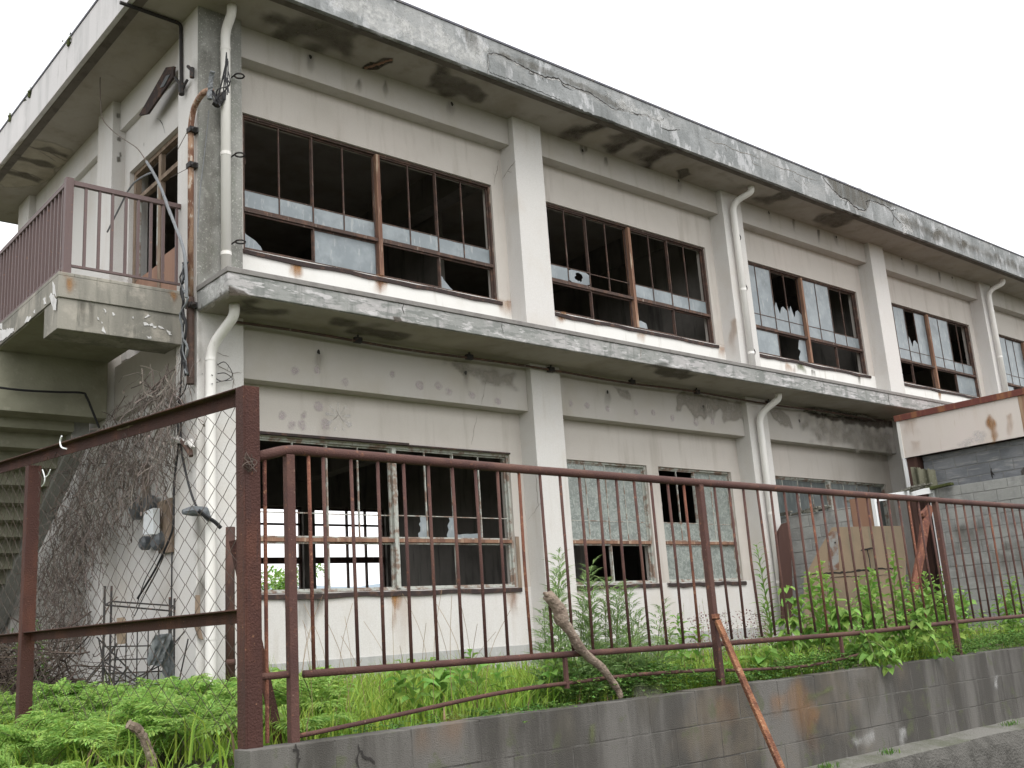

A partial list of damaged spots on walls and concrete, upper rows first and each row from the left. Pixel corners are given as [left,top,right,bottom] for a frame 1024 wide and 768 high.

leakage [431,66,486,103]
crack [487,52,677,131]
crack [706,138,903,229]
spalling [803,408,893,428]